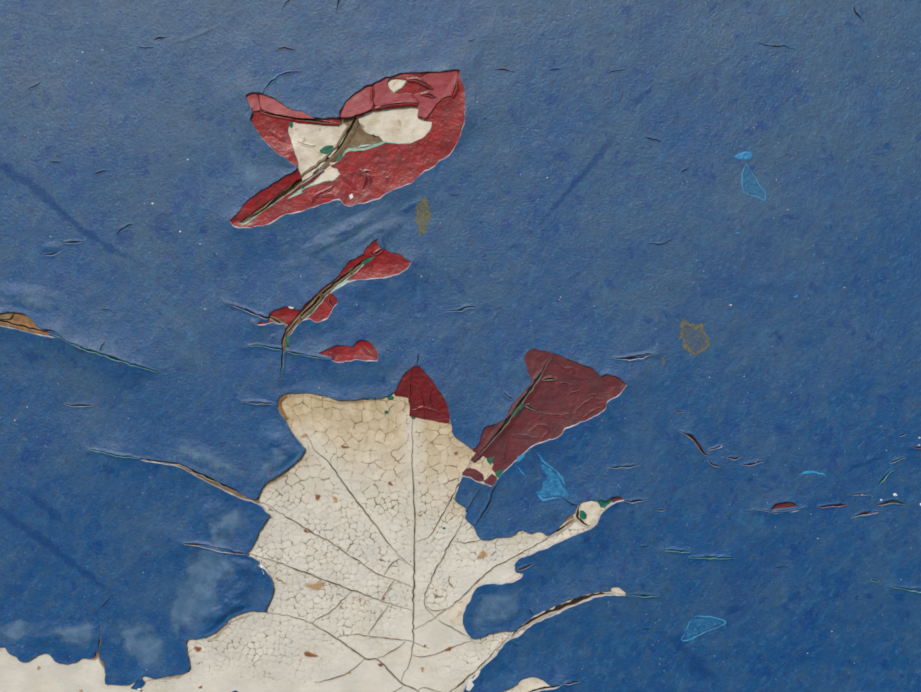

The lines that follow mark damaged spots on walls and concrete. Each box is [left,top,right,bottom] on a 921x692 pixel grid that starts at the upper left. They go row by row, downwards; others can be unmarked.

peeling [222,233,411,379]
peeling [230,69,465,228]
peeling [0,349,627,692]
crack [86,351,666,692]